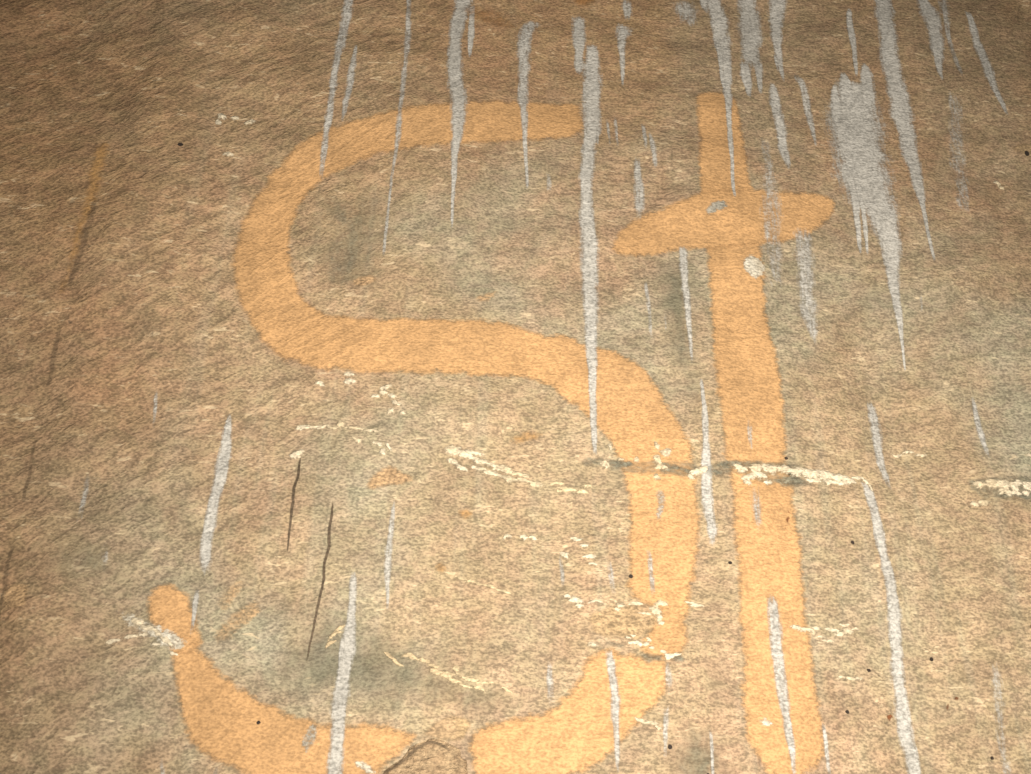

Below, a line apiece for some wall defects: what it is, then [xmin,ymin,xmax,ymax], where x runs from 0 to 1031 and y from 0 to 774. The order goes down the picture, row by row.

leakage [320,0,357,170]
leakage [447,0,475,224]
leakage [518,22,538,187]
leakage [572,18,618,452]
leakage [671,248,693,357]
leakage [676,0,816,276]
leakage [828,0,935,369]
leakage [918,0,961,79]
leakage [967,13,1007,113]
leakage [200,416,232,571]
leakage [315,574,373,774]
leakage [862,483,921,774]